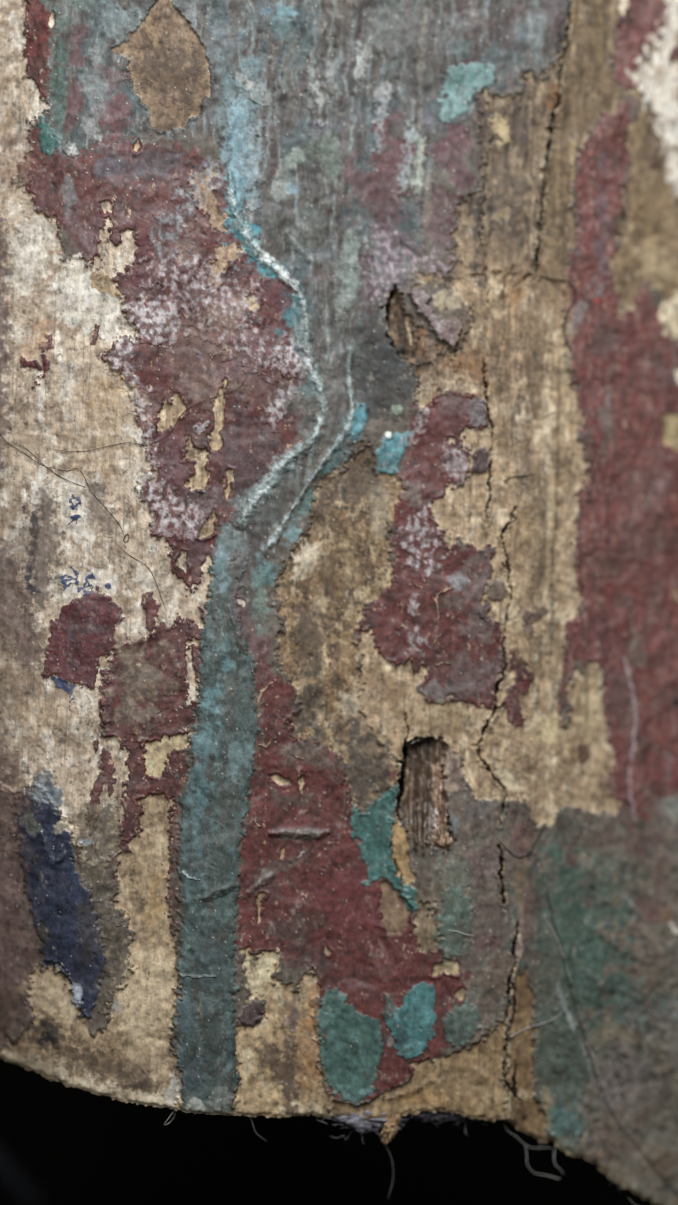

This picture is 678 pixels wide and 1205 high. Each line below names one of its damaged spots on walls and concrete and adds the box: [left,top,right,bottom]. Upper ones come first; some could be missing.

peeling [199,190,246,272]
crack [478,0,576,304]
peeling [0,0,216,1110]
peeling [183,378,228,491]
peeling [224,469,234,499]
peeling [271,0,678,1001]
crack [454,350,522,1106]
peeling [231,945,560,1146]